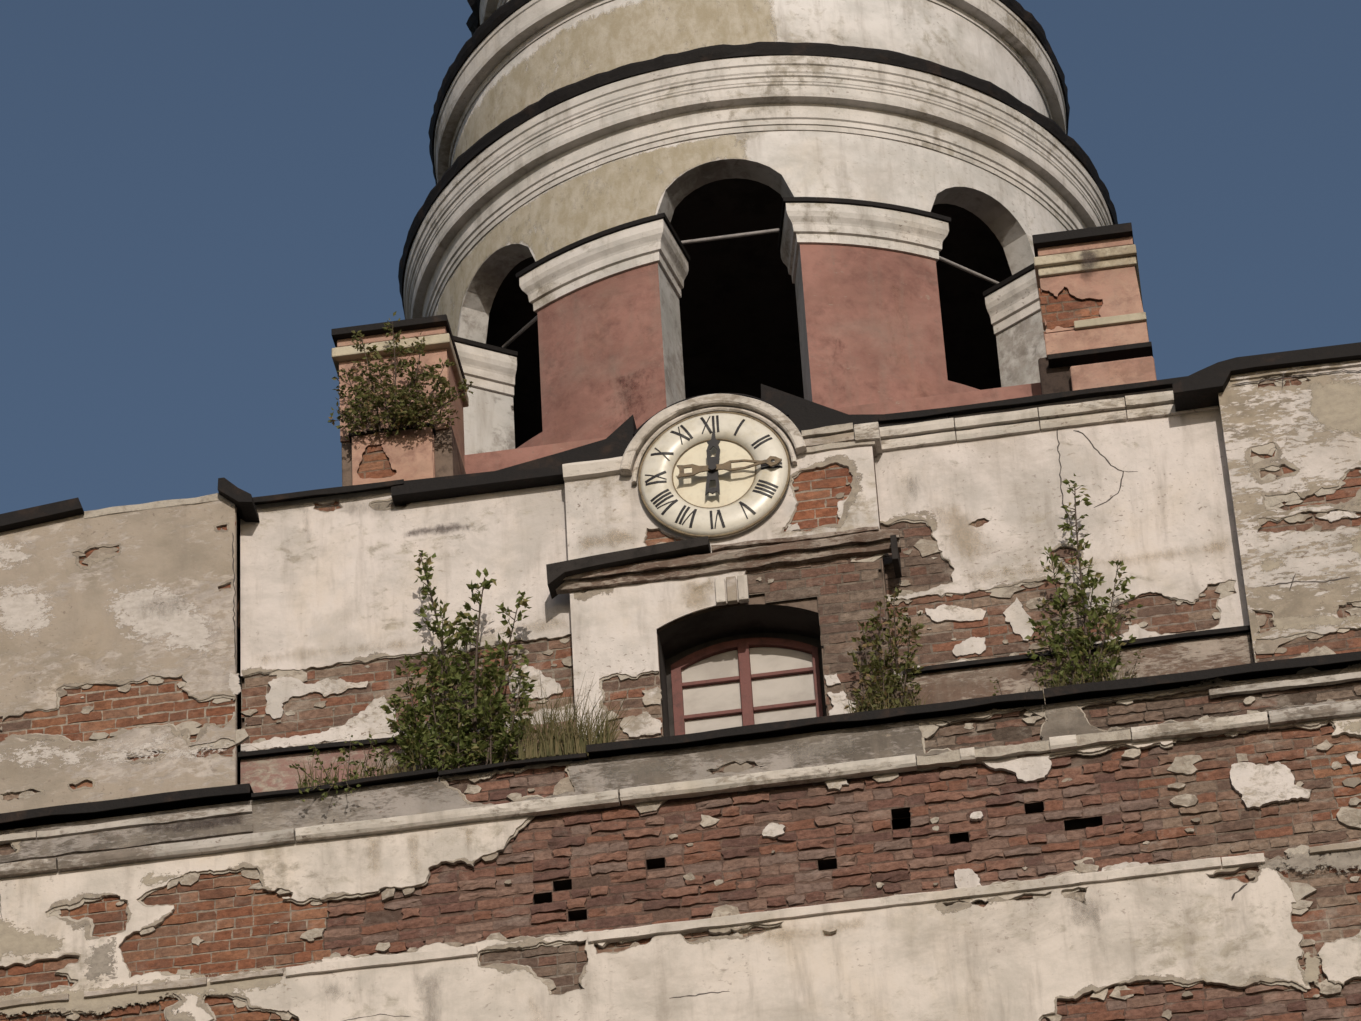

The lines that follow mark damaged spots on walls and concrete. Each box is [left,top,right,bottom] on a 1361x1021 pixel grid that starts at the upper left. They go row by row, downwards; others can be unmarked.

flaking render [1038,287,1103,340]
flaking render [1256,373,1311,389]
flaking render [313,499,343,512]
flaking render [369,497,411,511]
flaking render [782,454,863,533]
crack [1057,429,1138,525]
flaking render [1244,441,1361,557]
flaking render [72,544,121,570]
flaking render [643,528,685,546]
flaking render [571,586,616,601]
flaking render [744,510,1237,716]
flaking render [0,600,1361,1021]